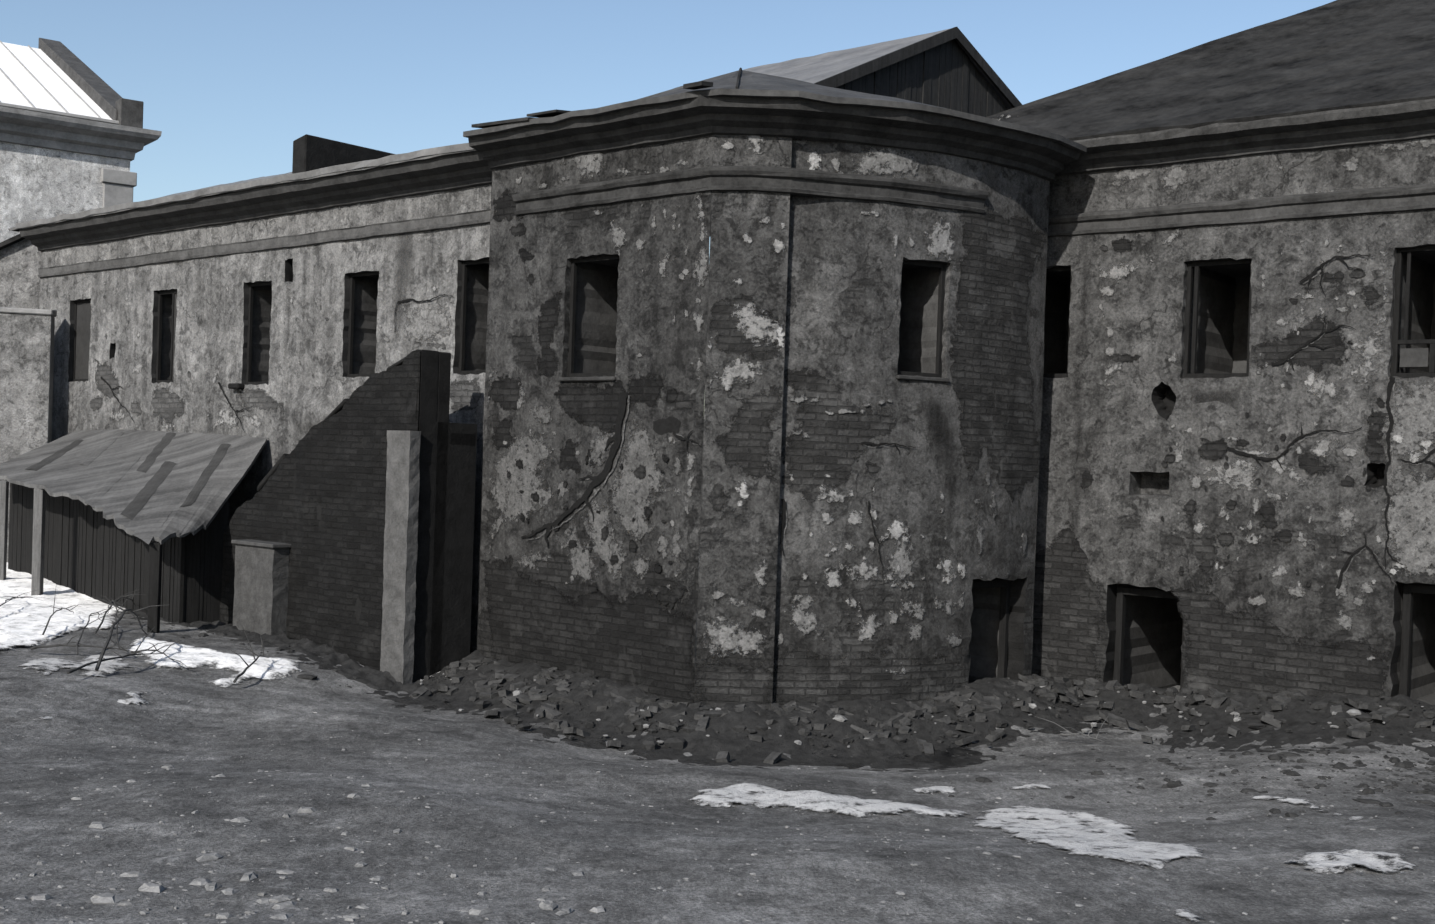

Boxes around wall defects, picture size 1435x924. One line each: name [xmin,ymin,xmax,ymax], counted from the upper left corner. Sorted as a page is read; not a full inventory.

peeling [1099,236,1154,387]
spalling [1251,238,1389,399]
crack [1271,254,1376,370]
crack [521,392,630,547]
crack [1226,376,1435,590]